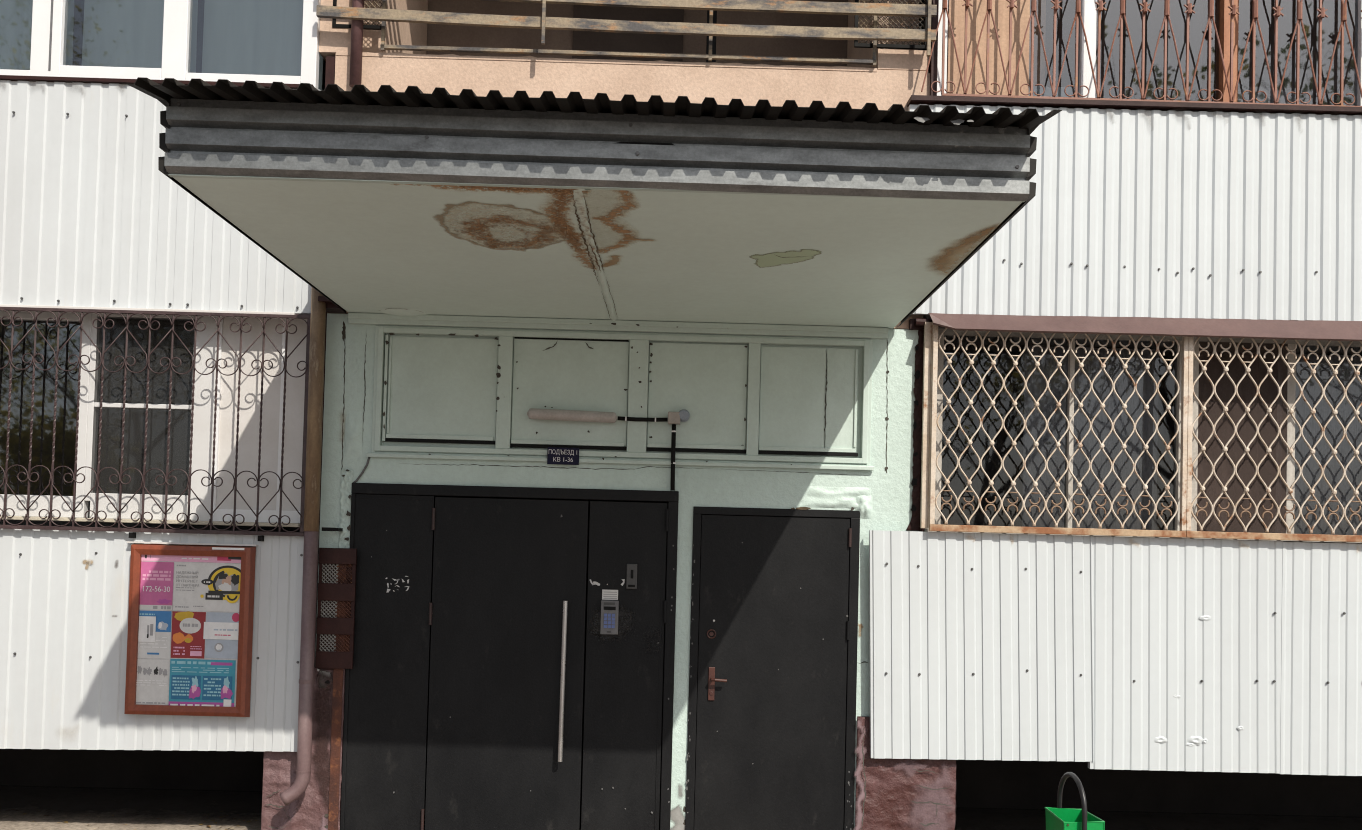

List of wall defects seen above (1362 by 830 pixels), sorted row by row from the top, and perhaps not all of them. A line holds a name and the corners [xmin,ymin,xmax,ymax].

rust [394,184,653,269]
crack [570,189,617,321]
peeling [750,249,821,268]